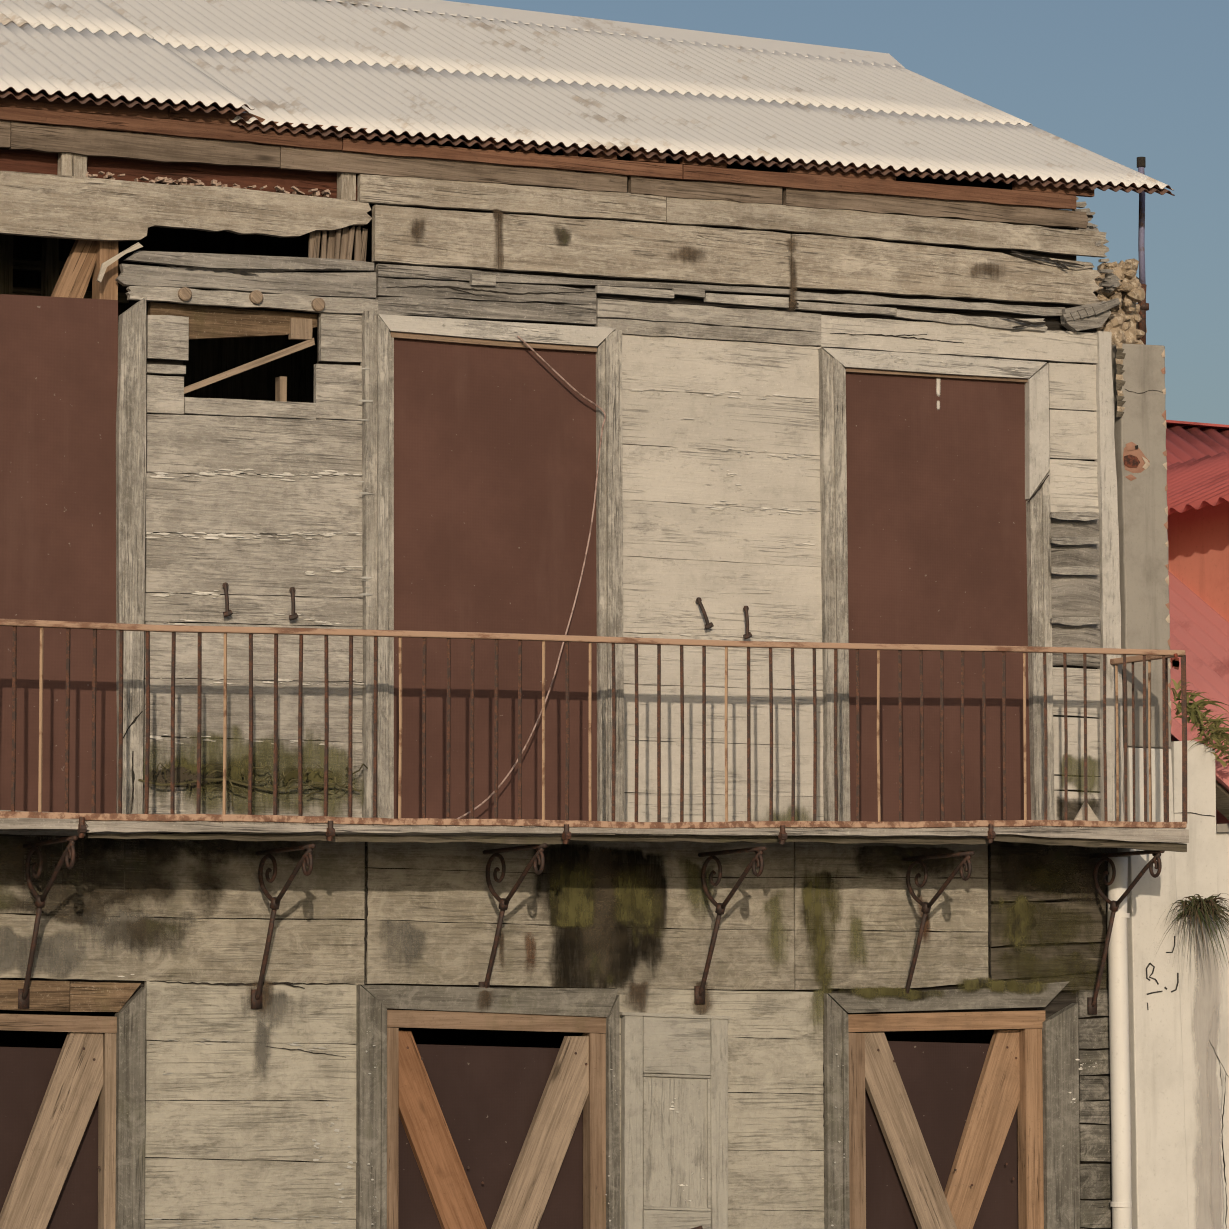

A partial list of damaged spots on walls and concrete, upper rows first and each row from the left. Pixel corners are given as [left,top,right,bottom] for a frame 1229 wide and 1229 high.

leakage [0,833,306,976]
leakage [534,844,667,1013]
leakage [802,871,865,1026]
crack [1209,1040,1229,1228]